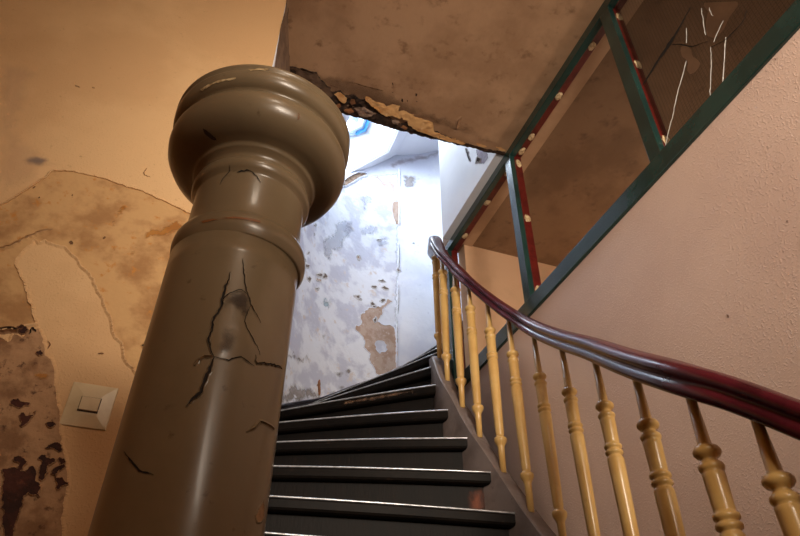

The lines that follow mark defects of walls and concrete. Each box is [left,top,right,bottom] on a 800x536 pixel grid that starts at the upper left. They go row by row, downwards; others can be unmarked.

spalling [290,66,506,164]
flaking render [0,169,191,536]
crack [185,263,283,408]
peeling [282,171,402,404]
crack [124,452,153,475]